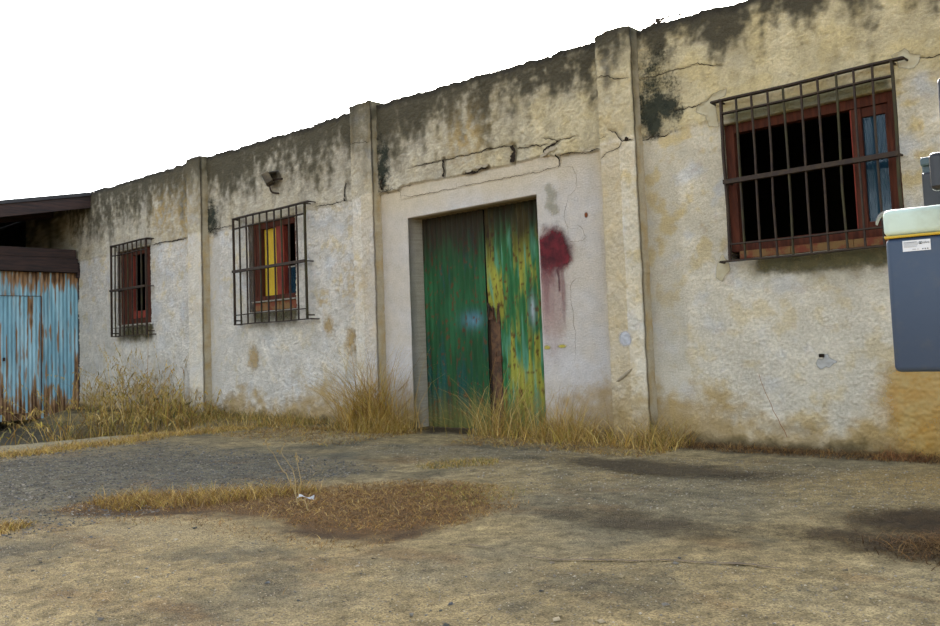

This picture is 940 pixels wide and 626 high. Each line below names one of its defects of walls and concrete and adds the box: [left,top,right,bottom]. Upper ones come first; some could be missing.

water stain [639,48,684,140]